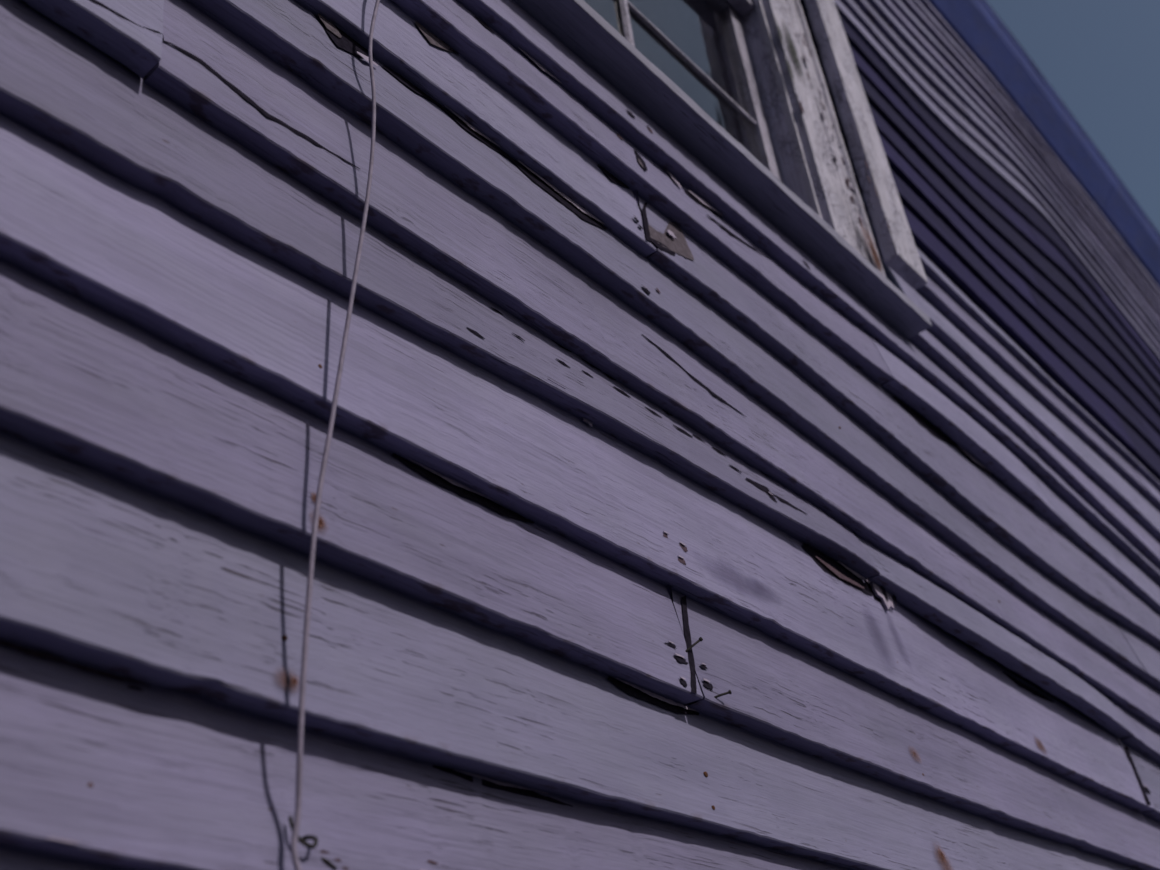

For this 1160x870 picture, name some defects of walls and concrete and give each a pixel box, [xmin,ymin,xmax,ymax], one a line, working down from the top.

crack [91,0,360,169]
spalling [649,222,694,260]
crack [746,477,808,515]
crack [802,543,882,603]
crack [607,596,732,716]